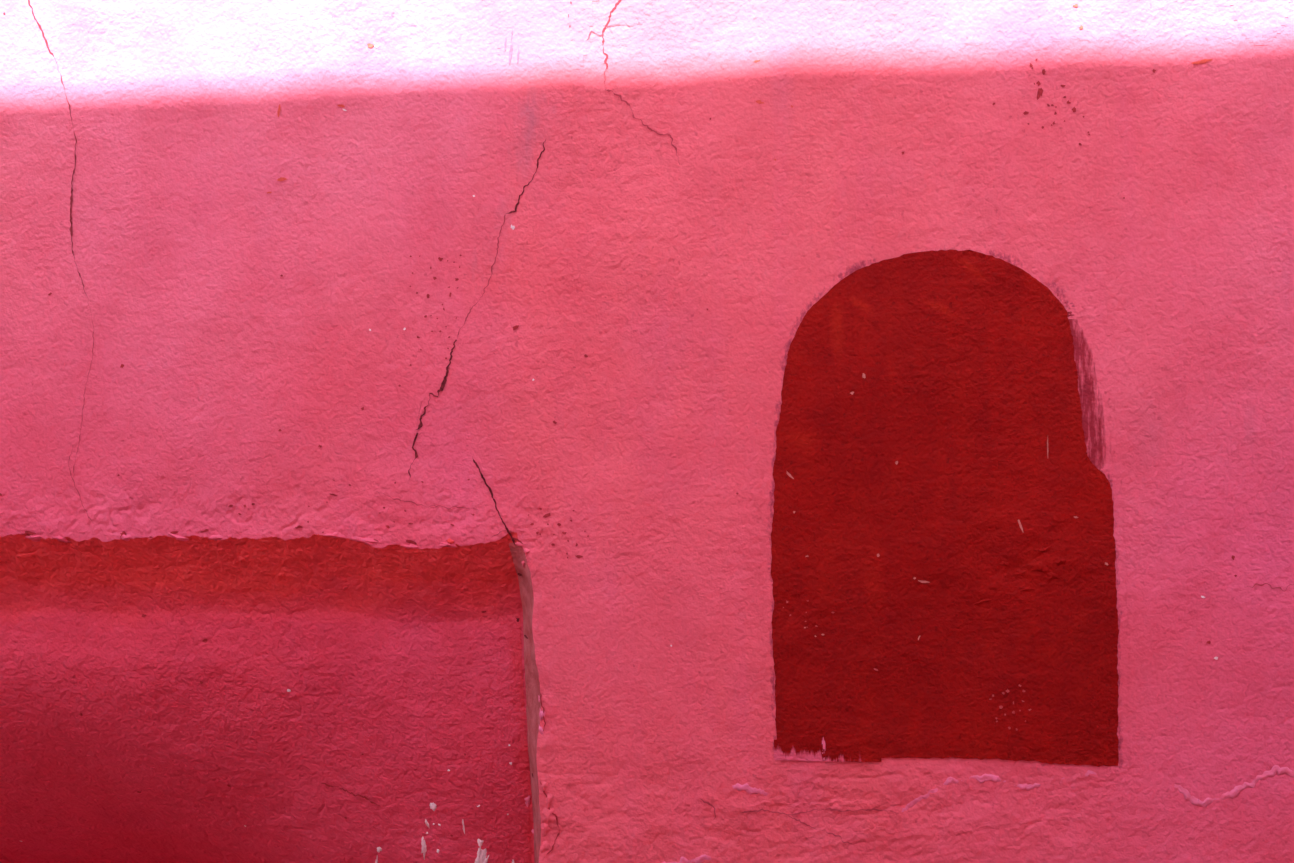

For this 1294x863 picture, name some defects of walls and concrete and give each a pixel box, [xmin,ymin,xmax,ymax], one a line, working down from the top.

crack [28,0,94,521]
crack [375,140,546,545]
crack [587,0,680,165]